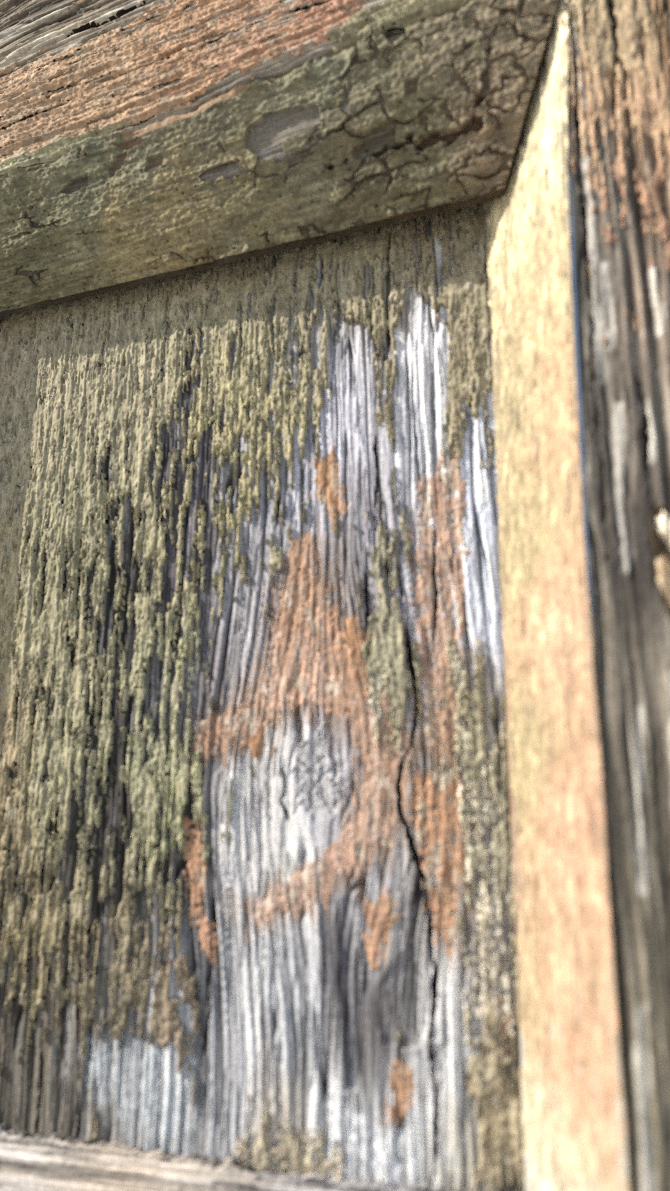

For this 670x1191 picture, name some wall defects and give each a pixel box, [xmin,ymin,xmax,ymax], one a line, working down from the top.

peeling [0,0,559,312]
peeling [568,0,670,272]
peeling [192,498,206,592]
crack [362,572,370,631]
peeling [241,725,267,762]
peeling [401,755,410,812]
crack [373,437,439,1183]
peeling [99,823,117,902]
peeling [149,870,200,1074]
peeling [360,886,401,971]
peeling [382,1032,416,1129]
peeling [227,1108,344,1184]